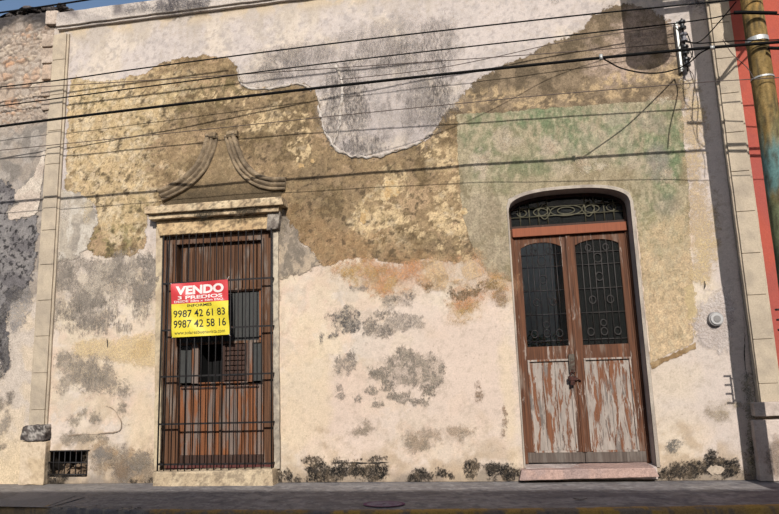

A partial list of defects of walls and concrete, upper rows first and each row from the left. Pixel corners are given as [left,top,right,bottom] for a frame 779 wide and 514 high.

water stain [255,43,455,154]
peeling [8,150,46,220]
peeling [380,179,400,201]
peeling [279,208,321,279]
peeling [456,80,719,369]
water stain [54,247,162,341]
water stain [320,292,424,342]
water stain [334,346,445,408]
water stain [277,455,388,483]
water stain [406,467,455,482]
water stain [463,458,520,481]
water stain [658,437,754,480]